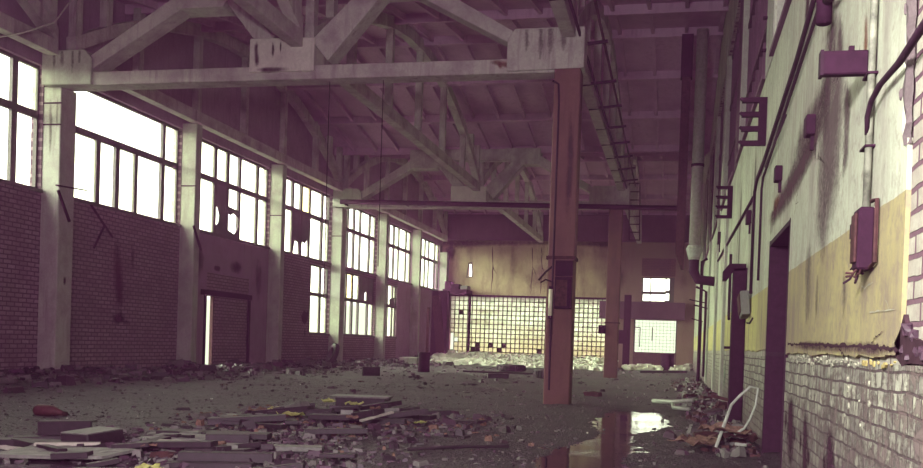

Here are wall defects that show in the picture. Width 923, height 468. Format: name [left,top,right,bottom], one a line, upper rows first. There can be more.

flaking render [899,0,917,146]
damp [770,77,830,223]
spalling [790,314,923,392]
damp [785,400,809,468]
damp [823,432,834,468]